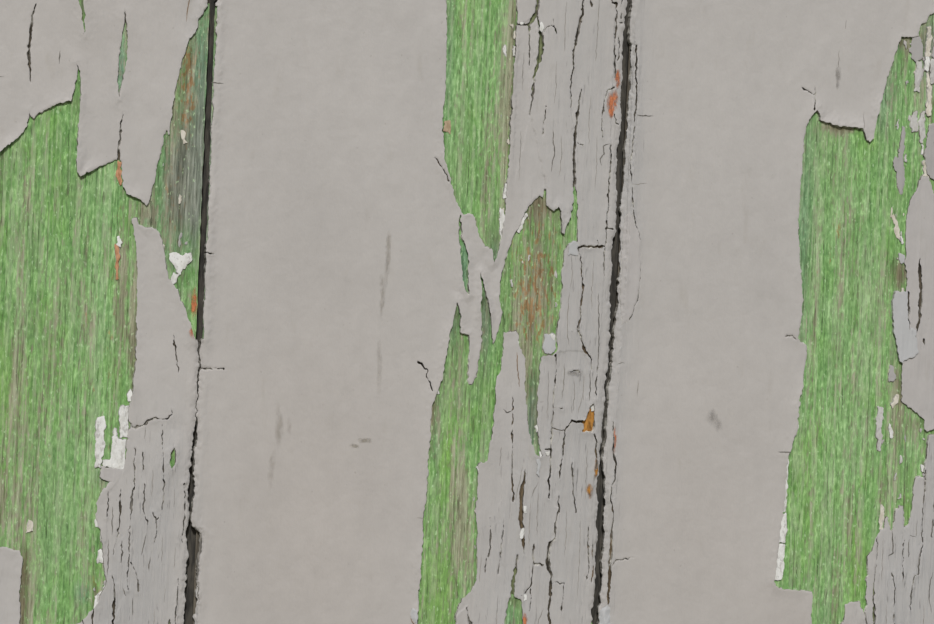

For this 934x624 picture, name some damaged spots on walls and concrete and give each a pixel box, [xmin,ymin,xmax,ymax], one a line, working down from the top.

crack [28,4,36,82]
peeling [0,3,217,624]
peeling [417,0,578,624]
crack [479,0,651,624]
rust [608,71,620,117]
peeling [774,14,934,624]
crack [872,505,934,624]